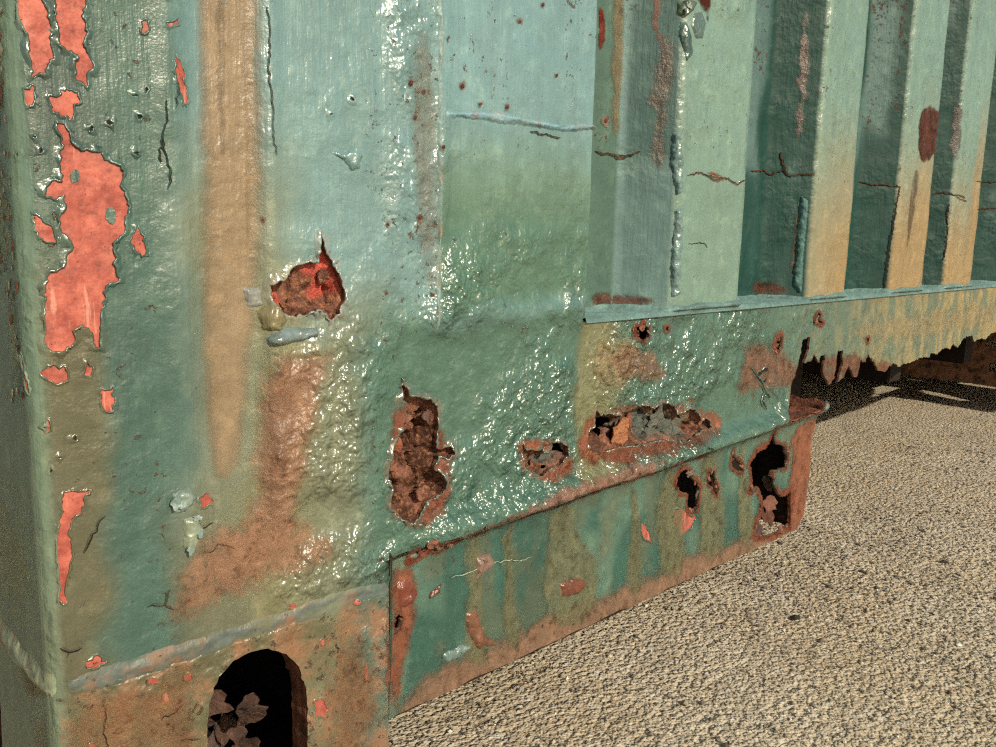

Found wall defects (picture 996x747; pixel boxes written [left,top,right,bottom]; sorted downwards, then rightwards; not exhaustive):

rust [919,106,939,162]
rust [951,106,962,156]
peeling [0,0,151,414]
peeling [53,487,93,606]
rust [387,411,816,711]